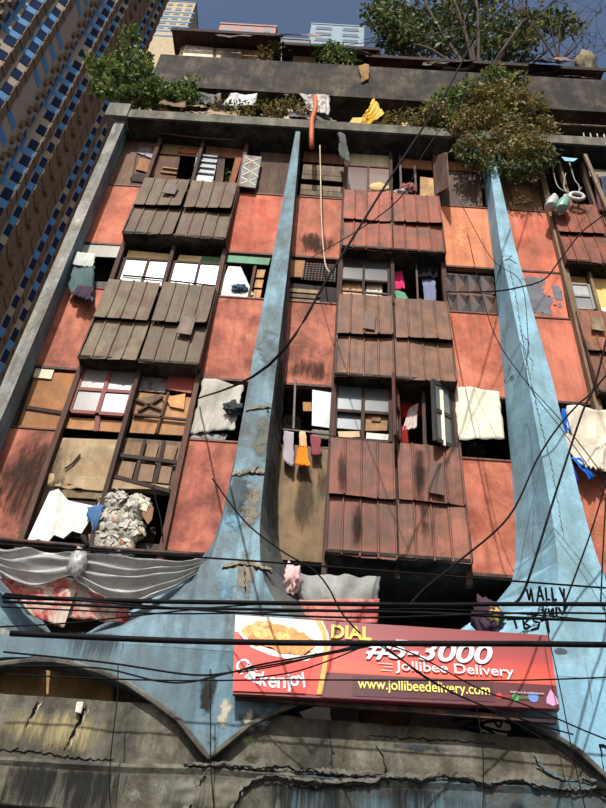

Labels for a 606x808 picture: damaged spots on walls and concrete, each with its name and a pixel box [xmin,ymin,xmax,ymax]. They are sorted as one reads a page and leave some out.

peeling [524,276,563,315]
leakage [253,331,283,540]
peeling [230,467,265,526]
leakage [0,766,119,808]
crack [183,732,606,808]